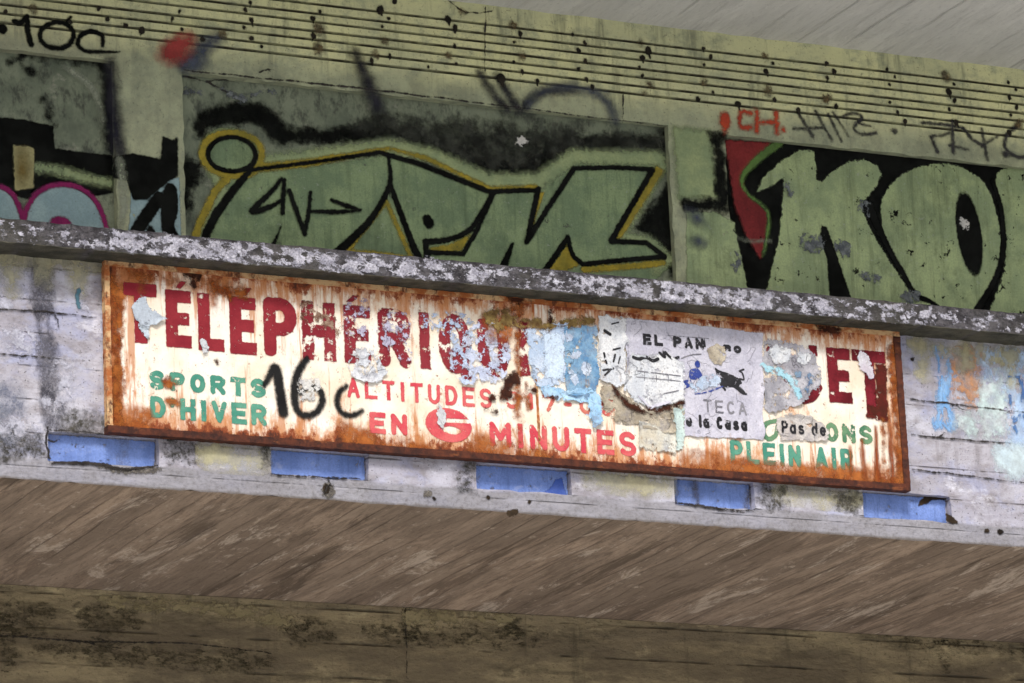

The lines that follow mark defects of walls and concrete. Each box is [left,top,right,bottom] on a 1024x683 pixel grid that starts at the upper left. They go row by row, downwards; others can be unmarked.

peeling [0,220,1024,332]
damp [0,254,105,462]
rust [110,268,248,428]
rust [300,300,343,338]
rust [482,297,596,415]
rust [818,325,841,334]
rust [341,422,430,449]
rust [469,435,550,458]
rust [612,386,685,415]
rust [681,344,904,483]
damp [0,602,271,674]